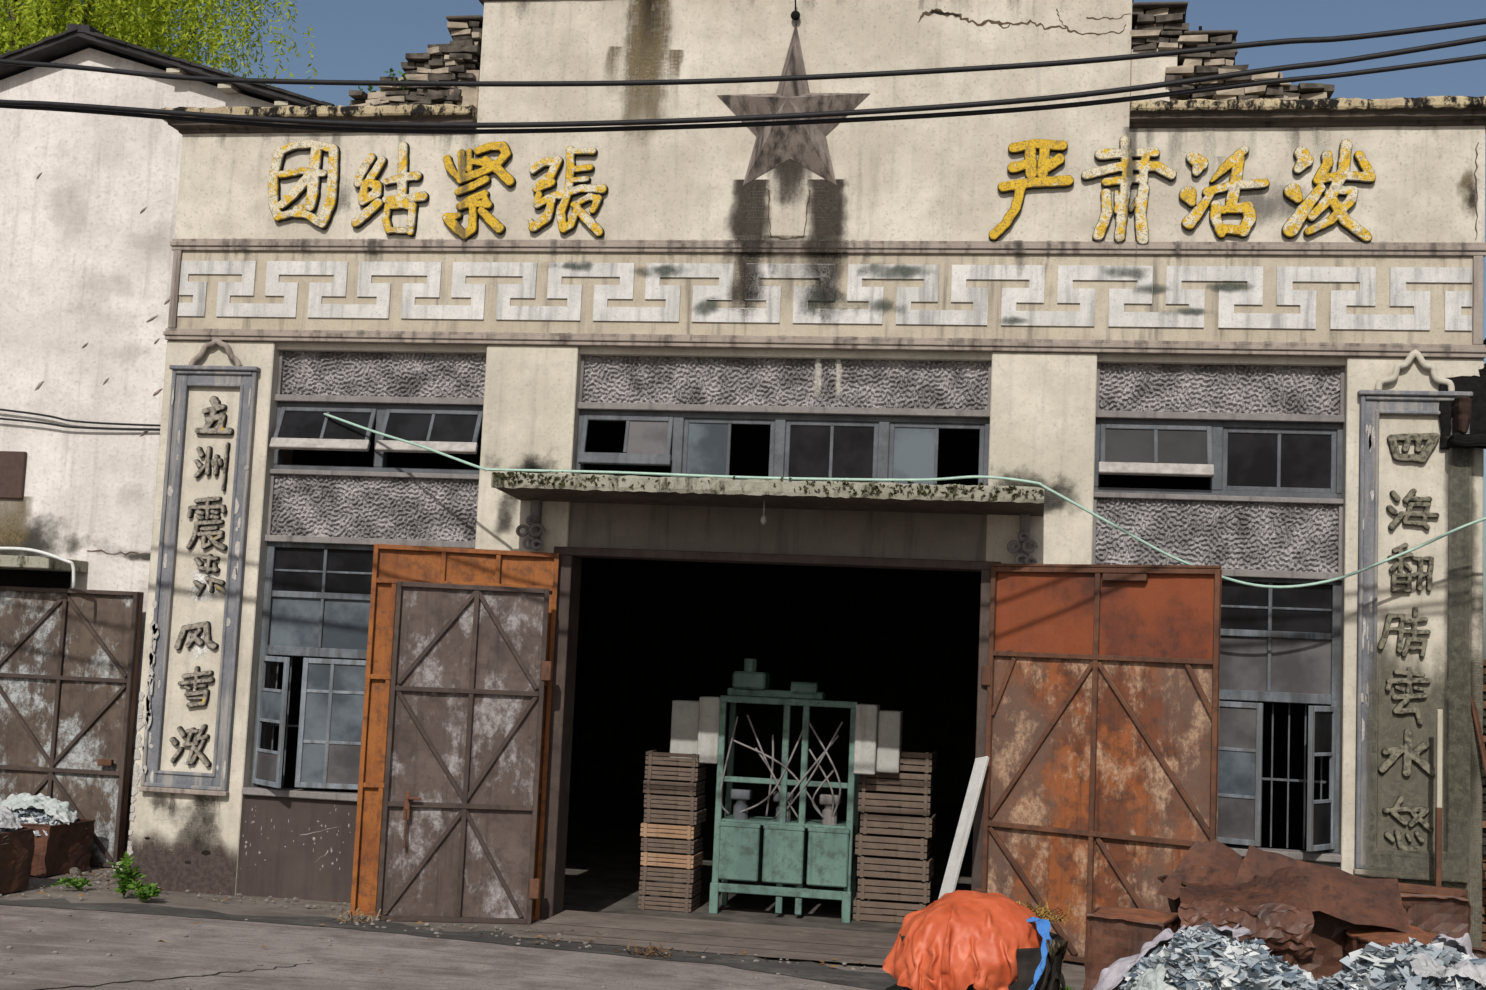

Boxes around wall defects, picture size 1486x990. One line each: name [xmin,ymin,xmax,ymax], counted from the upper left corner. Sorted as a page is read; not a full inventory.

crack [917,8,1129,35]
leakage [608,0,683,126]
leakage [697,159,868,315]
leakage [860,265,920,278]
leakage [874,300,892,310]
leakage [815,358,841,393]
leakage [127,793,237,896]
crack [34,963,313,990]